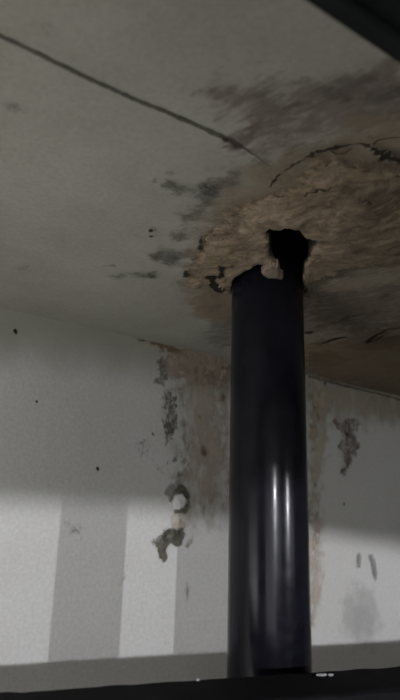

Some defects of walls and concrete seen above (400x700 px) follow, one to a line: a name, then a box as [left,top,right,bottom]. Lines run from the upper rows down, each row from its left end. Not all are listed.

crack [0,34,400,188]
water stain [183,116,400,242]
spalling [183,153,400,306]
flaking render [154,349,231,388]
water stain [303,262,400,396]
spalling [153,471,192,563]
water stain [163,373,227,503]
water stain [309,400,360,531]